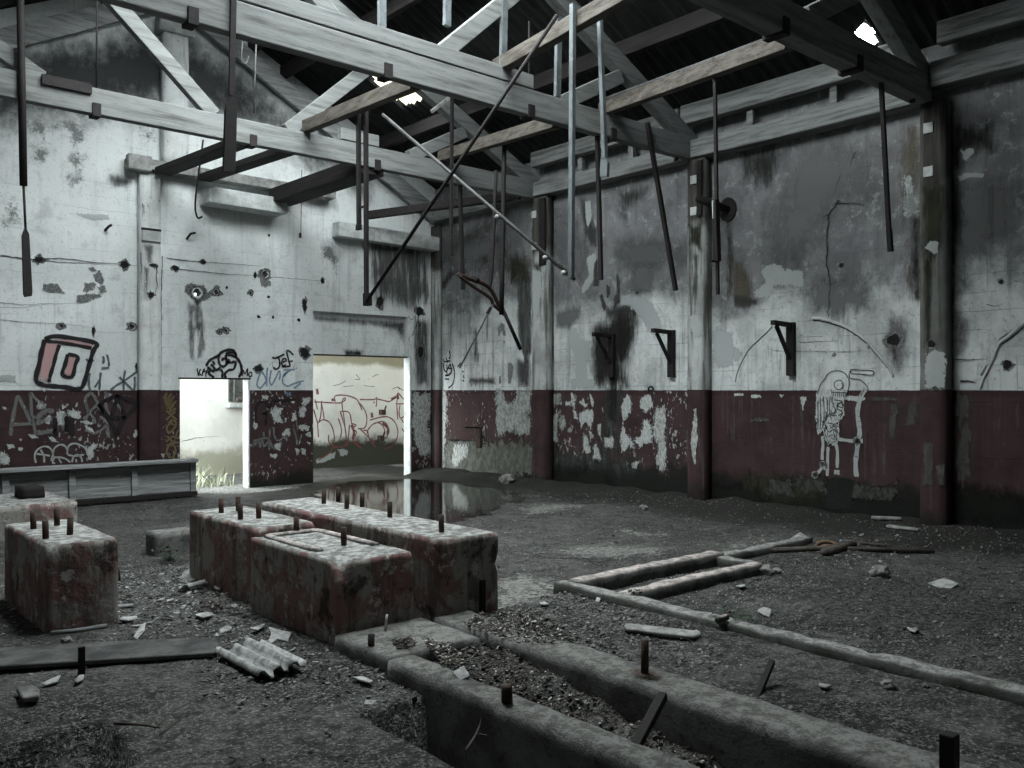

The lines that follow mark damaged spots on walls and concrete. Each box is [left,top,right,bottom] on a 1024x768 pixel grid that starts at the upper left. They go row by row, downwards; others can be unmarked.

peeling [753,263,804,298]
crack [775,152,864,352]
peeling [0,401,98,465]
peeling [262,395,348,464]
peeling [410,363,532,477]
leakage [553,306,638,486]
peeling [553,328,668,472]
peeling [690,409,698,465]